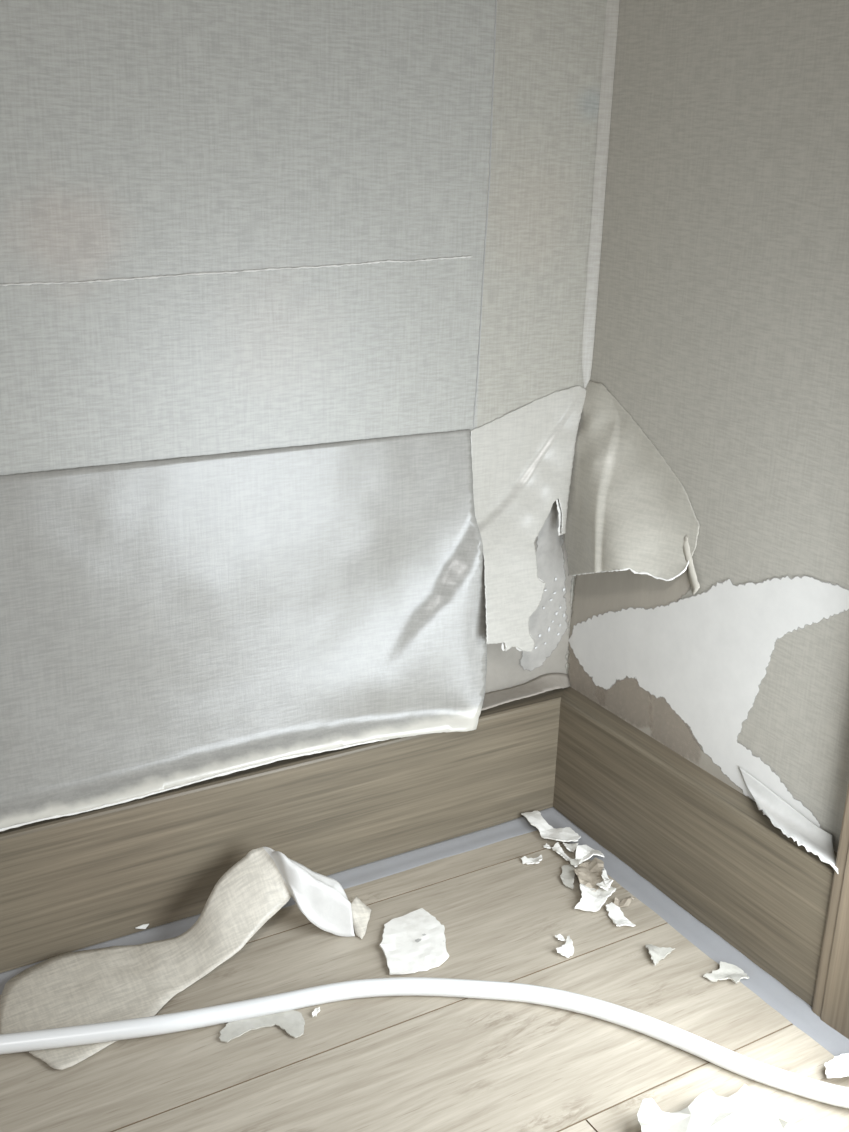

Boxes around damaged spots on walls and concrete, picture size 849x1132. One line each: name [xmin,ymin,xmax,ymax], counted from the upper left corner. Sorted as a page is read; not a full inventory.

peeling [485,534,849,827]
peeling [601,868,613,888]